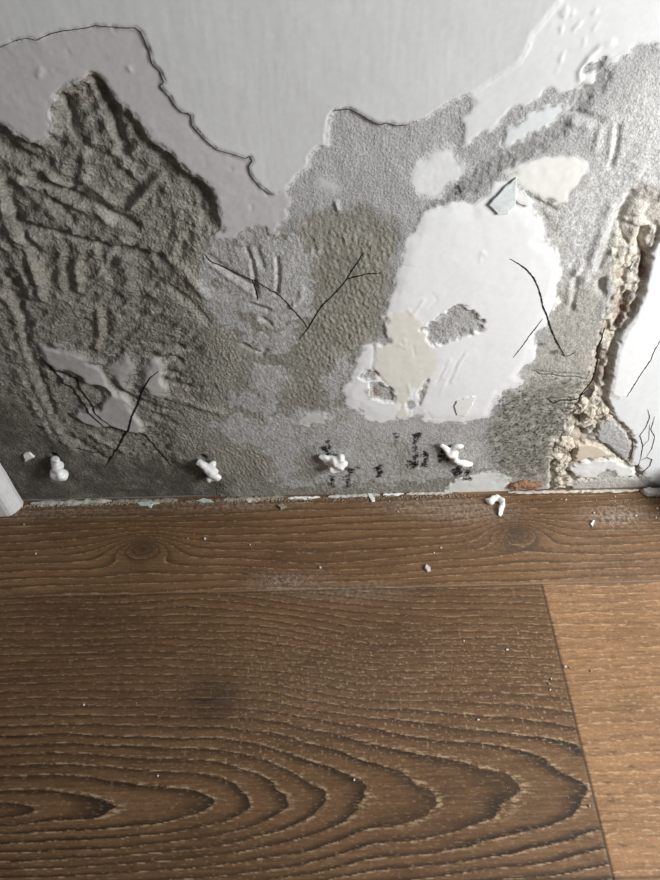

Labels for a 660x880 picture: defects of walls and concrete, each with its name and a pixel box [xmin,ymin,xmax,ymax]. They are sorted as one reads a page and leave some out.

crack [40,355,171,467]
crack [204,253,380,339]
flaking render [0,23,660,509]
crack [511,259,605,404]
crack [627,342,660,396]